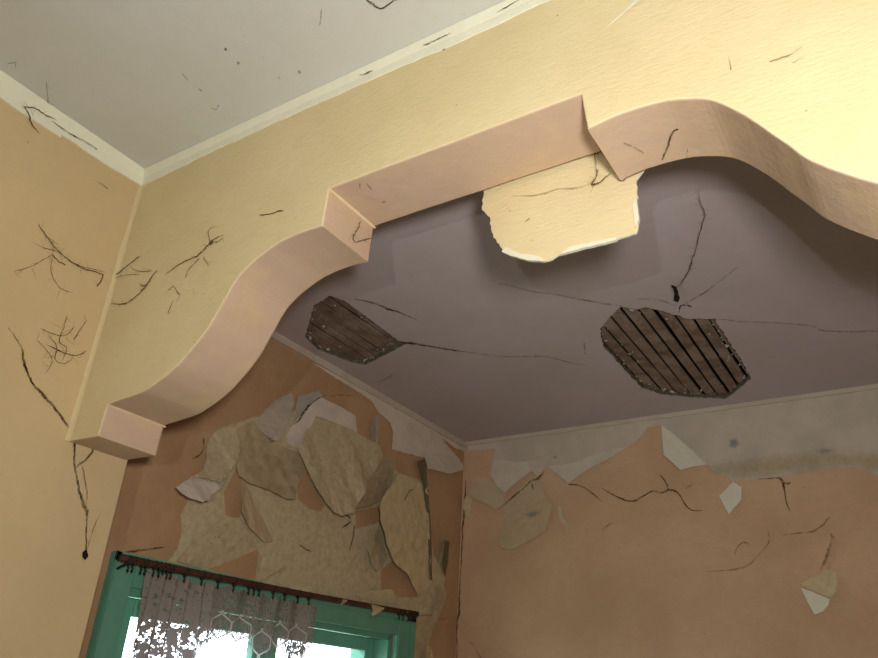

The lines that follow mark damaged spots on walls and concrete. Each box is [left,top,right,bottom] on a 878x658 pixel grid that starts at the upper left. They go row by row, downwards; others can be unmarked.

crack [366,0,395,10]
peeling [482,151,645,263]
crack [113,226,223,309]
crack [14,335,67,424]
flaking render [305,296,404,364]
crack [403,342,470,353]
flaking render [600,307,750,398]
crack [73,443,96,560]
peeling [168,363,878,658]
crack [505,473,543,504]
crack [568,475,702,511]
crack [762,477,790,511]